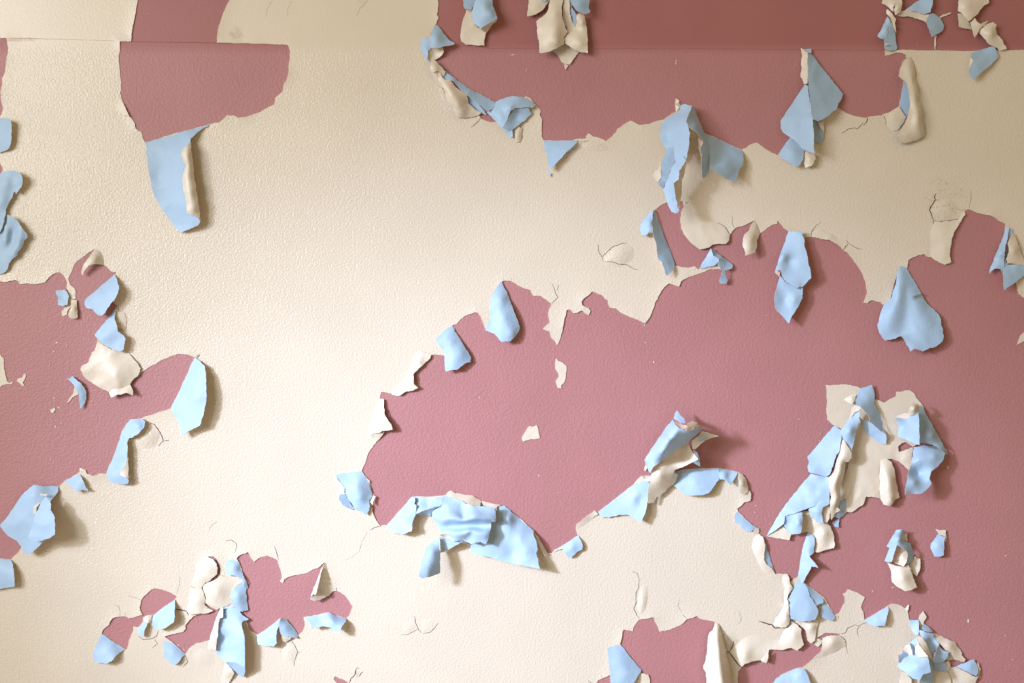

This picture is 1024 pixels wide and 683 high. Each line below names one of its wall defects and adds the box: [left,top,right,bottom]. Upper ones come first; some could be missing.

peeling [0,38,207,589]
peeling [116,0,290,232]
peeling [335,0,1024,683]
peeling [93,552,352,683]